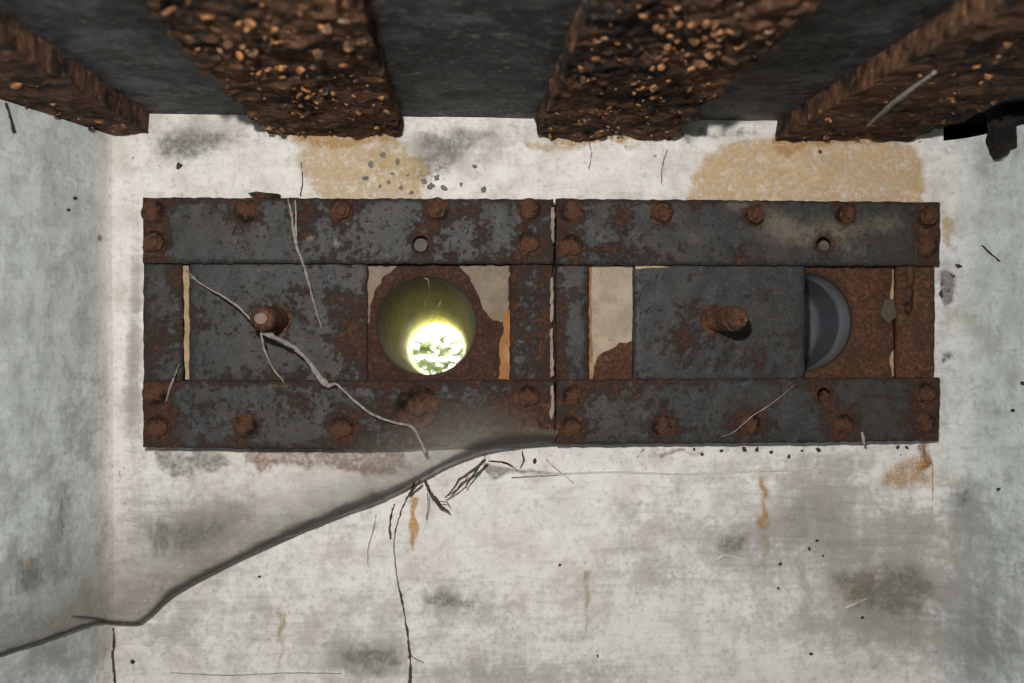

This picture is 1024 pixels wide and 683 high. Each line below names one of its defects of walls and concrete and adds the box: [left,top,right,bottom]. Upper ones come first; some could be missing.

corrosion [498,310,510,380]
corrosion [886,445,933,510]
corrosion [410,498,418,546]
crack [367,483,424,683]
crack [109,628,117,683]
crack [173,670,342,678]